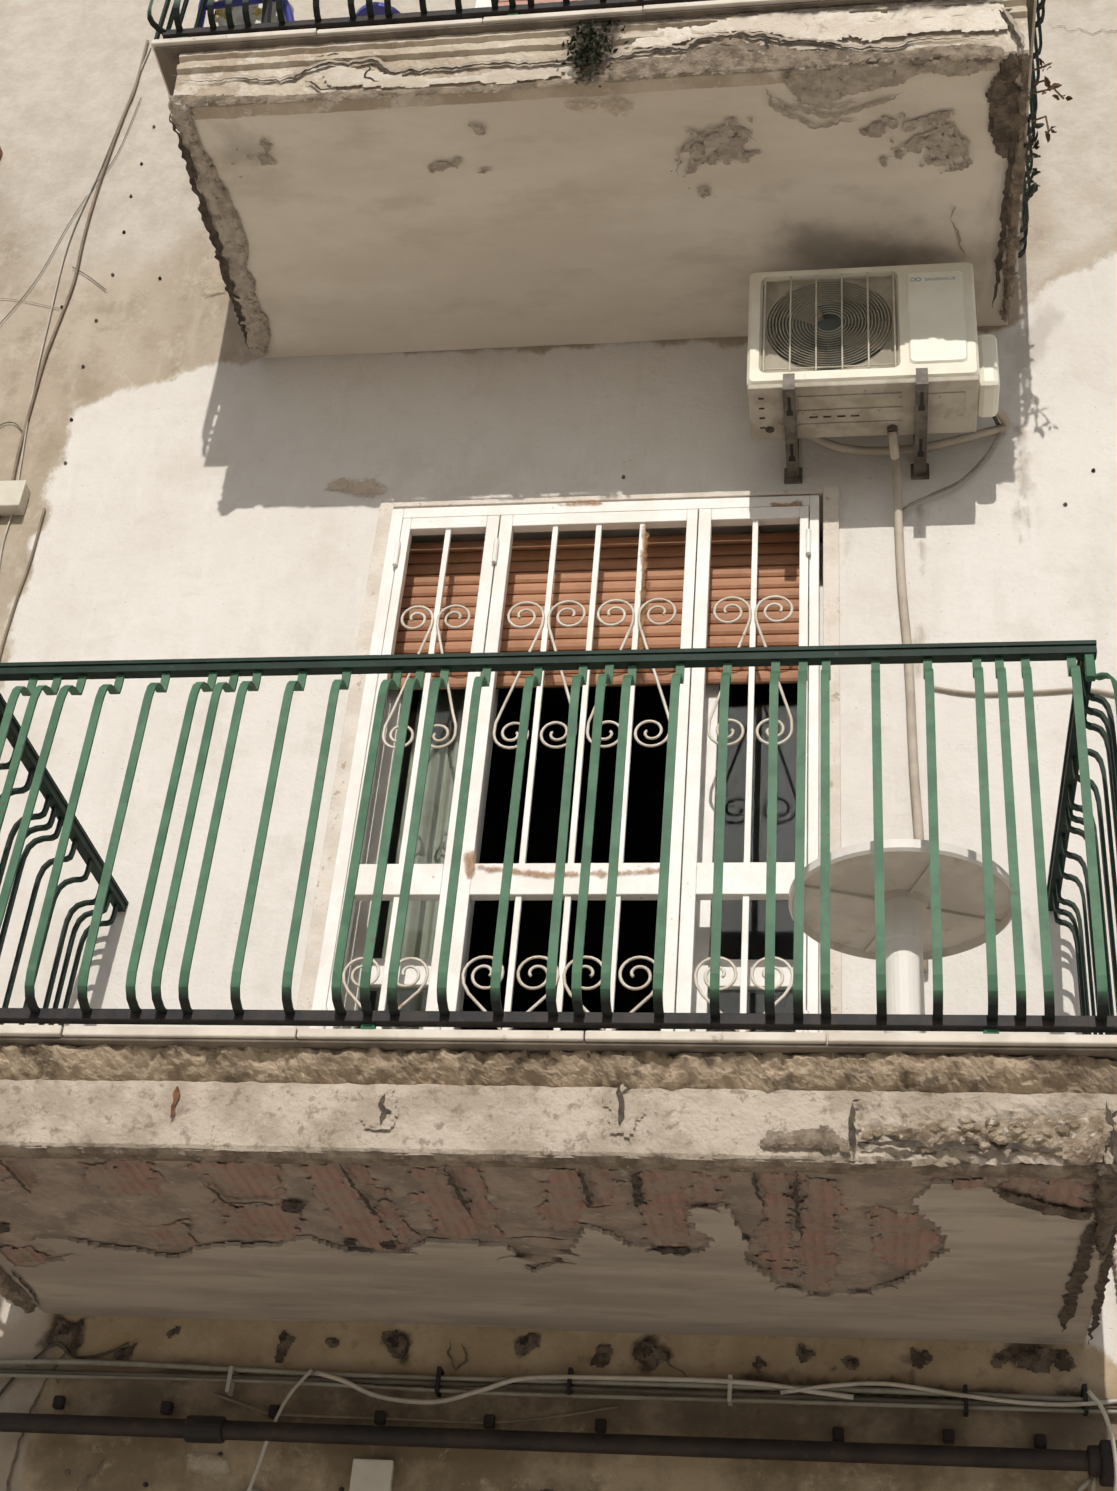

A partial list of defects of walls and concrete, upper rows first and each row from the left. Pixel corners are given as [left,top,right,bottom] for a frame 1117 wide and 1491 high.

crack [606,7,1117,61]
crack [173,53,570,90]
peeling [602,1,1031,322]
spalling [168,65,584,358]
spalling [359,1086,399,1130]
spalling [602,1084,647,1137]
flaking render [0,1109,1117,1313]
flaking render [43,1315,84,1353]
flaking render [381,1329,410,1361]
flaking render [990,1343,1077,1374]
water stain [740,1367,958,1399]
water stain [188,1454,229,1477]